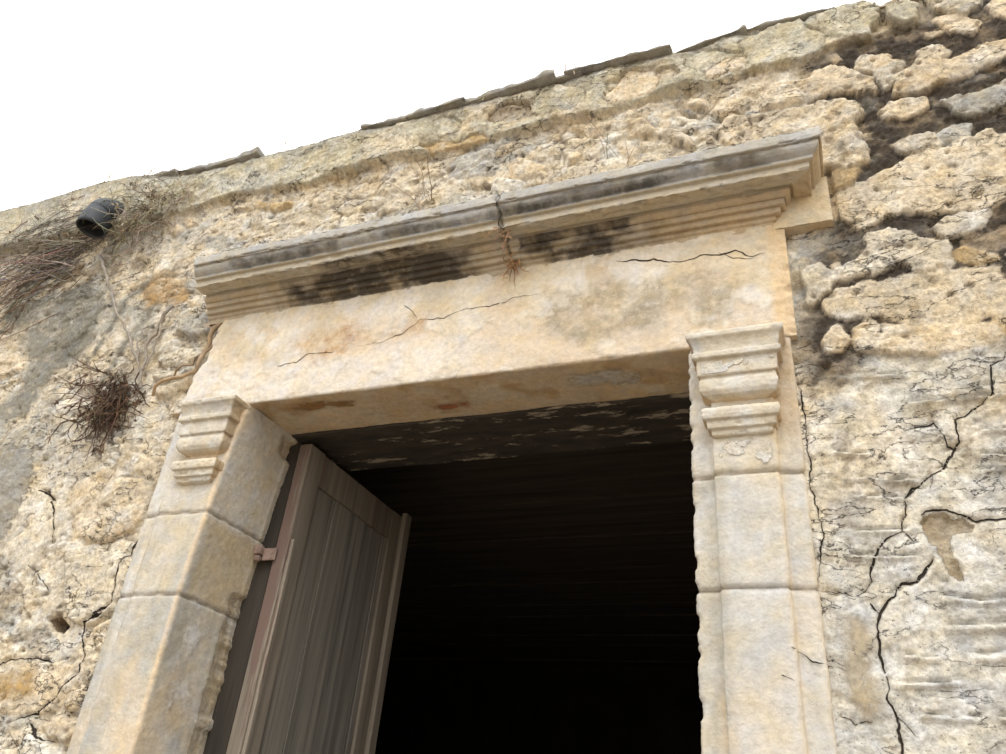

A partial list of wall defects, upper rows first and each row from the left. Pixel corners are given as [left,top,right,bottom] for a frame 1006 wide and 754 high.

leakage [506,203,550,216]
leakage [596,177,661,198]
leakage [290,246,469,304]
leakage [519,218,628,262]
crack [620,250,760,262]
leakage [549,282,663,338]
crack [798,356,1006,754]
spalling [920,513,974,581]